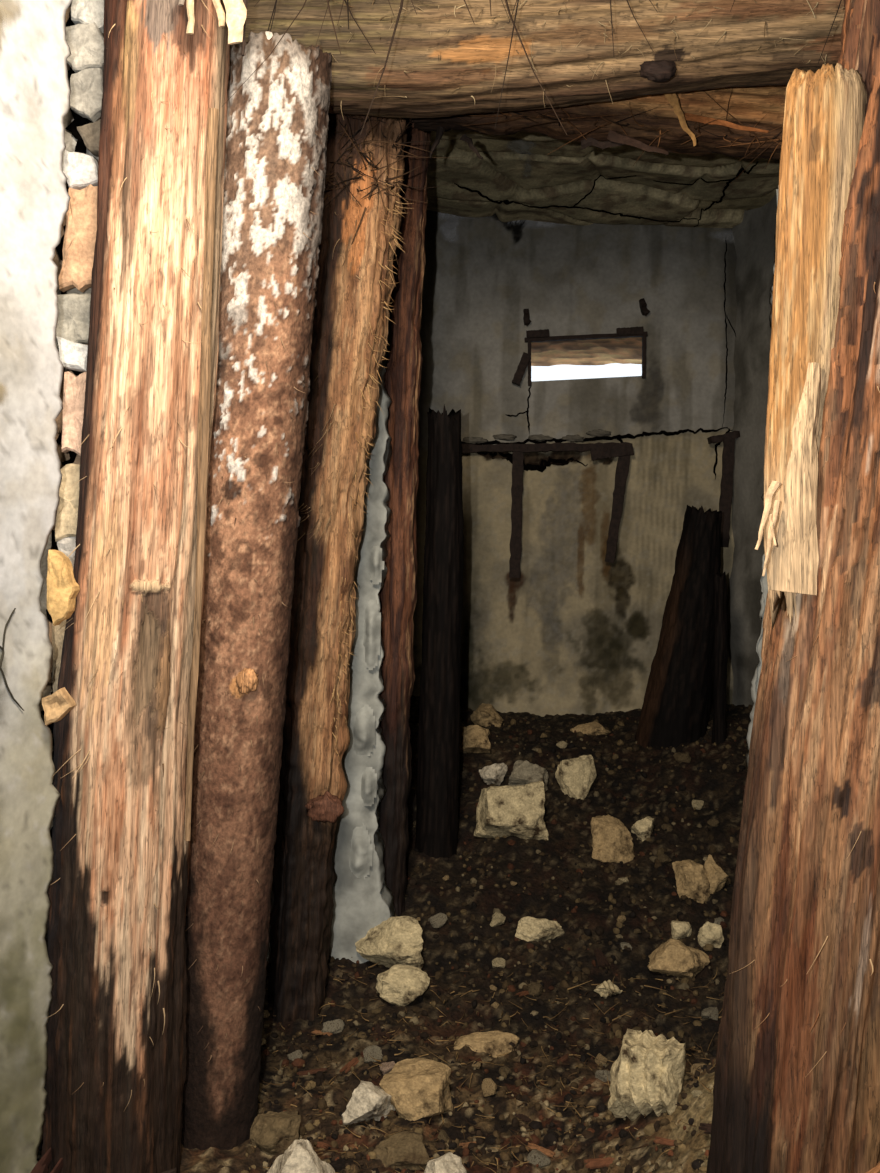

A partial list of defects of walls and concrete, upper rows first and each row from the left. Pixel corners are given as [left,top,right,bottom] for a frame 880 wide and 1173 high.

crack [66,11,75,27]
crack [65,67,96,154]
crack [454,162,758,227]
crack [56,225,66,261]
spalling [42,0,104,726]
crack [462,240,736,479]
crack [56,431,77,466]
crack [51,530,59,551]
rust [507,572,523,620]
water stain [583,541,647,711]
crack [0,608,54,780]